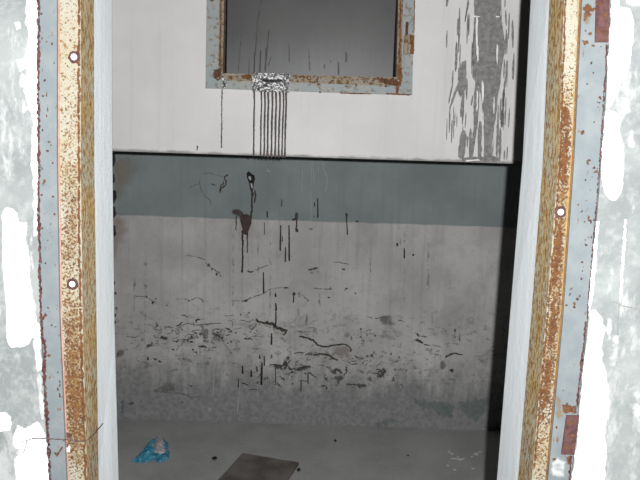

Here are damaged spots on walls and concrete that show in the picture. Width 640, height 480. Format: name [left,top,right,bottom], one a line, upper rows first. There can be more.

rust [210,0,232,80]
water stain [253,91,287,158]
rust [332,1,411,96]
peeling [446,0,515,162]
peeling [601,0,640,201]
peeling [0,0,49,480]
rust [36,0,87,480]
crack [249,319,352,361]
rust [533,0,608,480]
peeling [571,221,619,480]
peeling [610,219,627,302]
peeling [629,386,640,434]